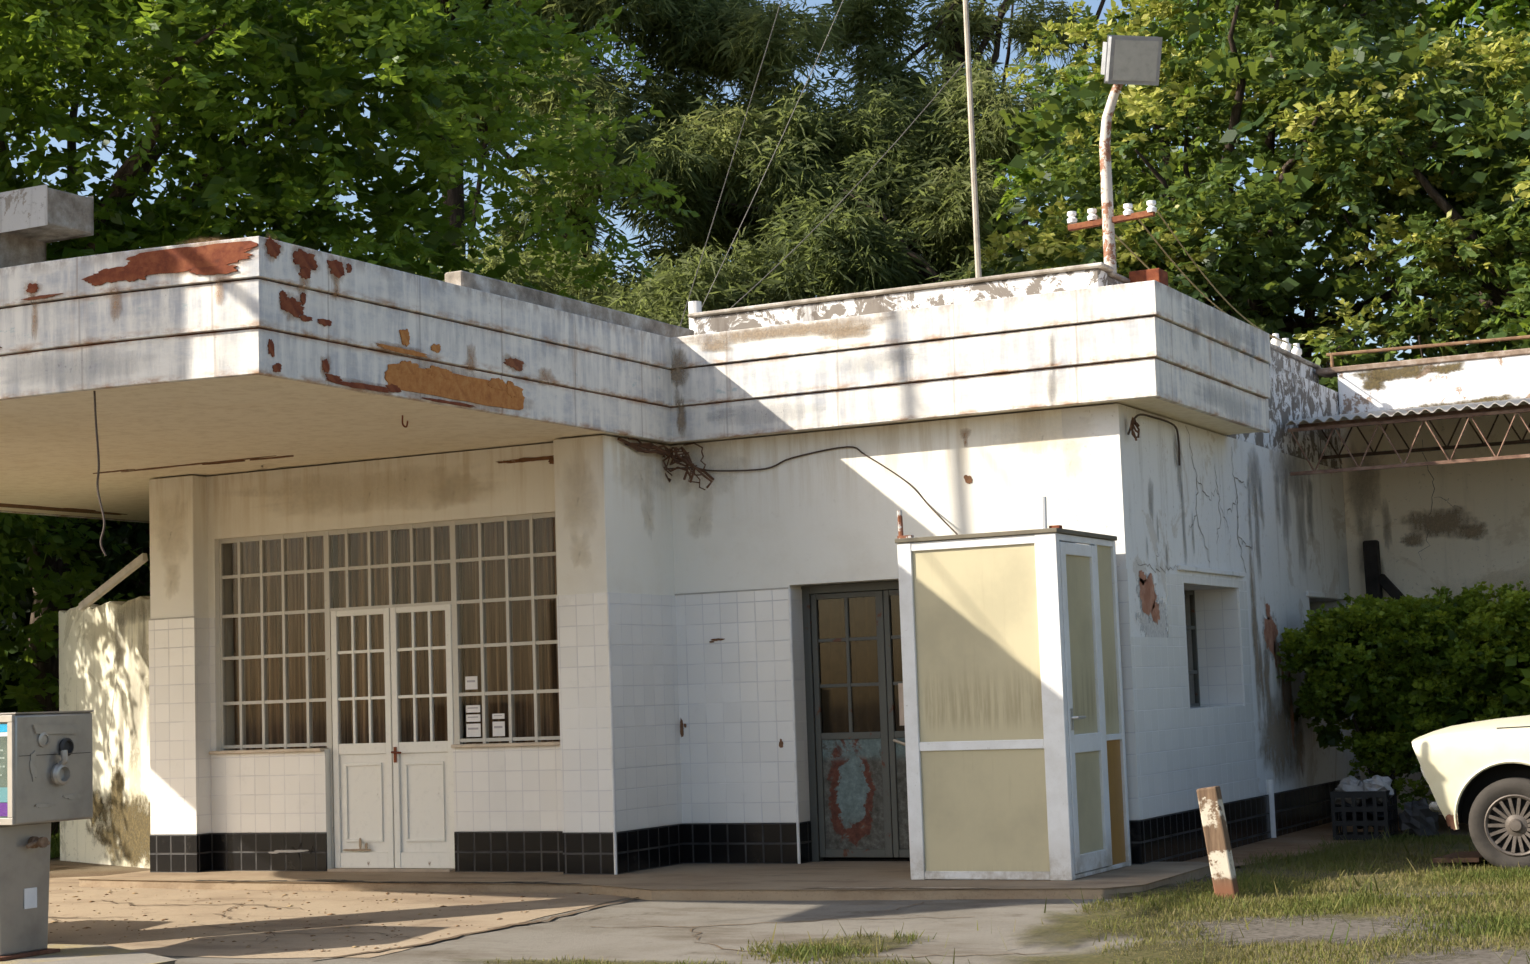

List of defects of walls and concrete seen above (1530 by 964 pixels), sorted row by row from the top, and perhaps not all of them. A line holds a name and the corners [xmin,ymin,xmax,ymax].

corrosion [21,283,63,331]
corrosion [81,237,352,327]
crack [1136,425,1253,573]
flaking render [1136,570,1170,638]
leakage [1250,563,1304,777]
leakage [91,765,124,826]